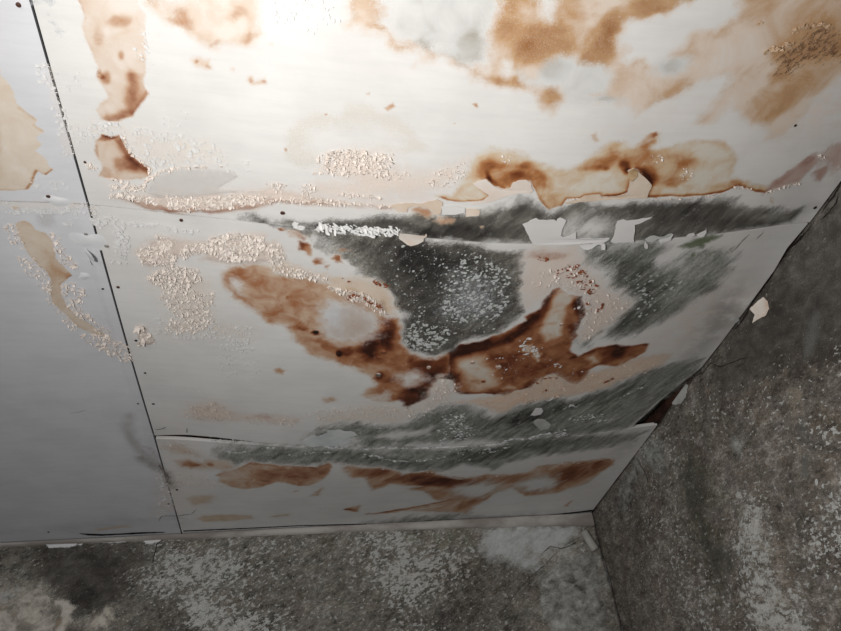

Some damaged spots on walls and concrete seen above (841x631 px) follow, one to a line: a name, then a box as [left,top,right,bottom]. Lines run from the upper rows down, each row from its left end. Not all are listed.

rust [77,0,273,122]
rust [85,133,153,184]
peeling [109,143,533,217]
rust [434,130,841,210]
peeling [130,230,403,353]
peeling [292,220,427,246]
rust [219,261,650,409]
damp [209,187,841,480]
peeling [512,217,652,344]
peeling [644,233,673,249]
rust [159,440,617,515]
damp [24,541,154,629]